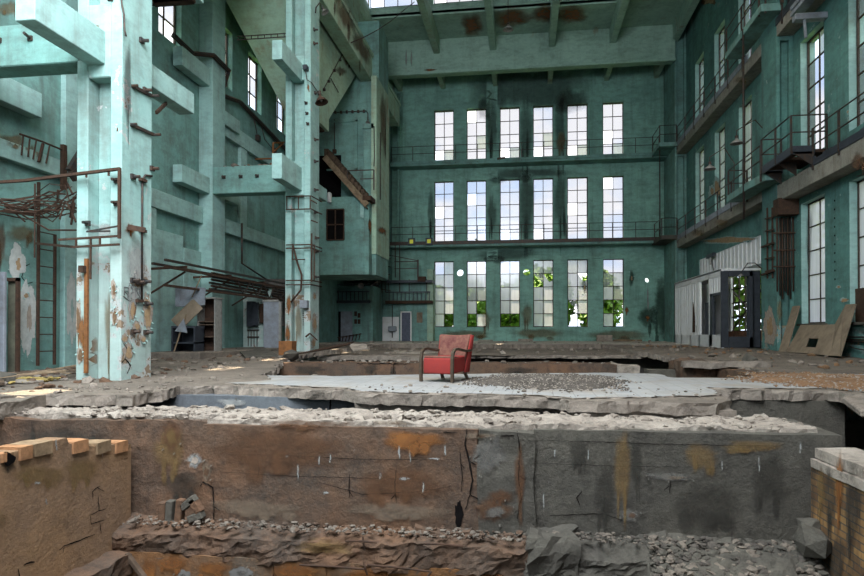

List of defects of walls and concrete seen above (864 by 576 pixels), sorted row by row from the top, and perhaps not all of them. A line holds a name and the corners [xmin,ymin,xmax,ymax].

rust [463,15,482,34]
rust [497,6,584,26]
peeling [8,242,36,362]
peeling [109,278,154,364]
crack [60,486,105,552]
crack [200,429,478,519]
rust [387,432,441,456]
water stain [598,443,640,532]